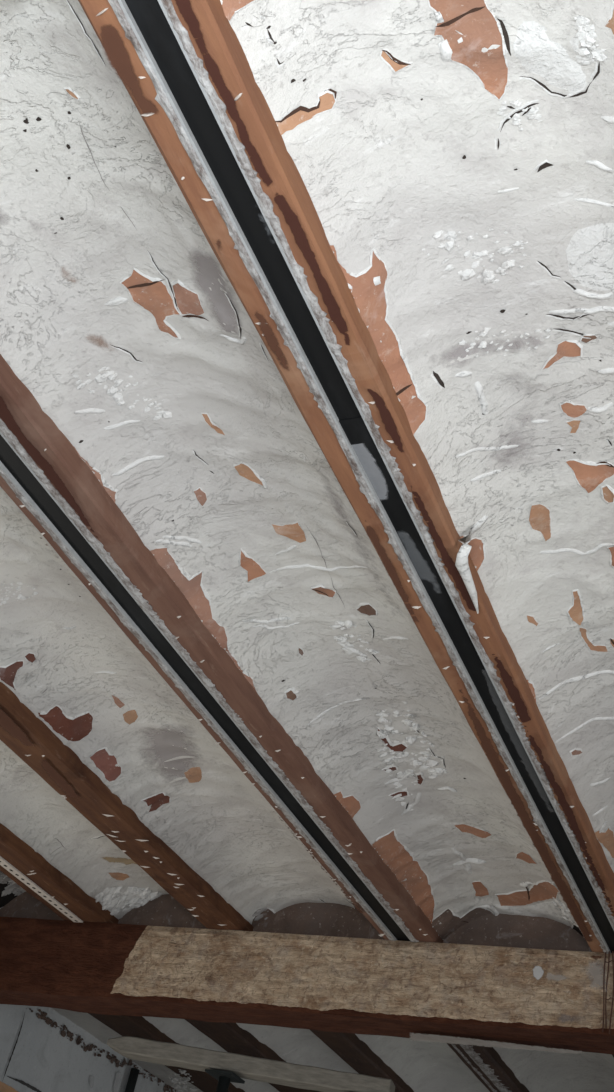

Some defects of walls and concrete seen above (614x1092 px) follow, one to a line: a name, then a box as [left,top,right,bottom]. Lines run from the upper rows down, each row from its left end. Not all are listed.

flaking render [222,0,257,21]
flaking render [275,88,337,135]
flaking render [427,0,543,132]
crack [494,18,600,149]
flaking render [120,268,208,339]
flaking render [566,589,614,652]
flaking render [38,705,93,742]
flaking render [371,829,584,940]